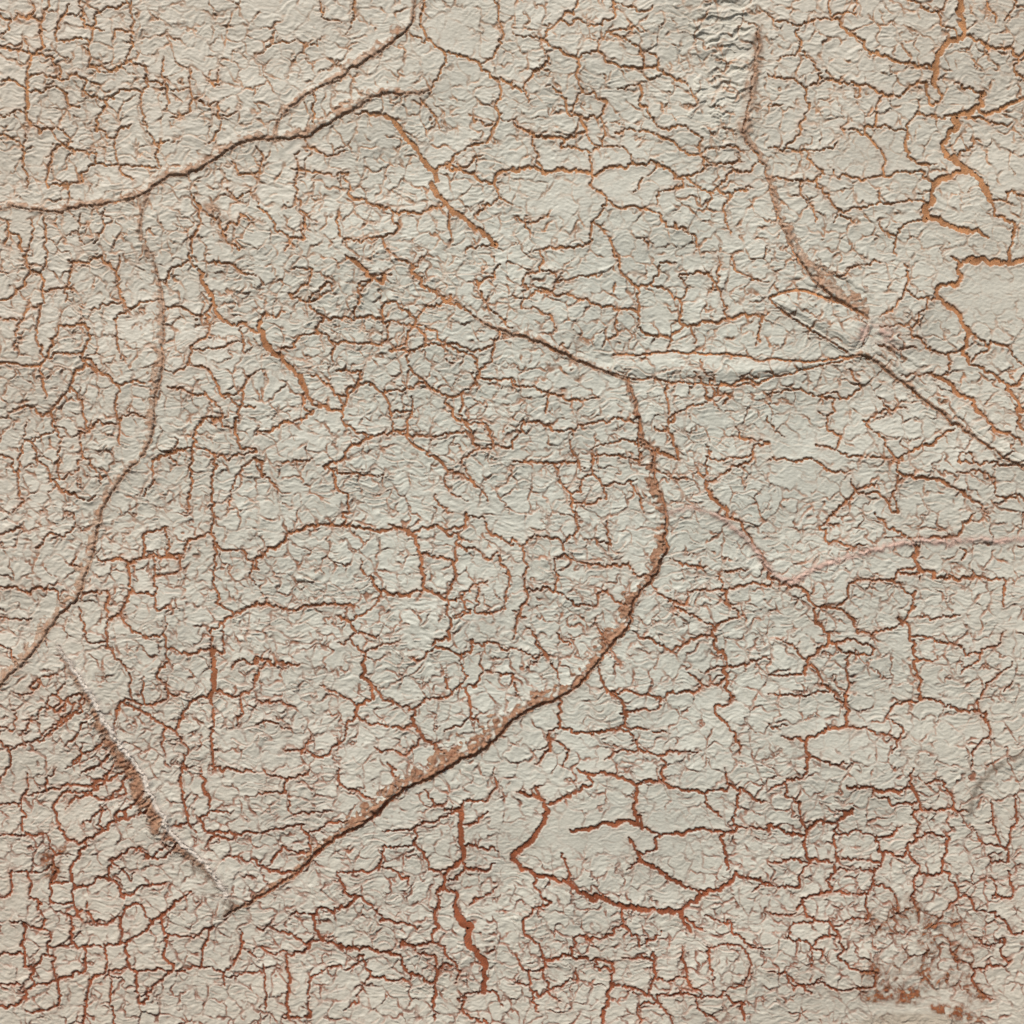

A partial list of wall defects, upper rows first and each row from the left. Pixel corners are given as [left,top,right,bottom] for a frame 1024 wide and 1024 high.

crack [0,754,268,1024]
crack [79,609,197,833]
crack [0,0,752,783]
crack [165,194,1024,1024]
crack [742,69,898,319]
crack [768,0,1024,549]